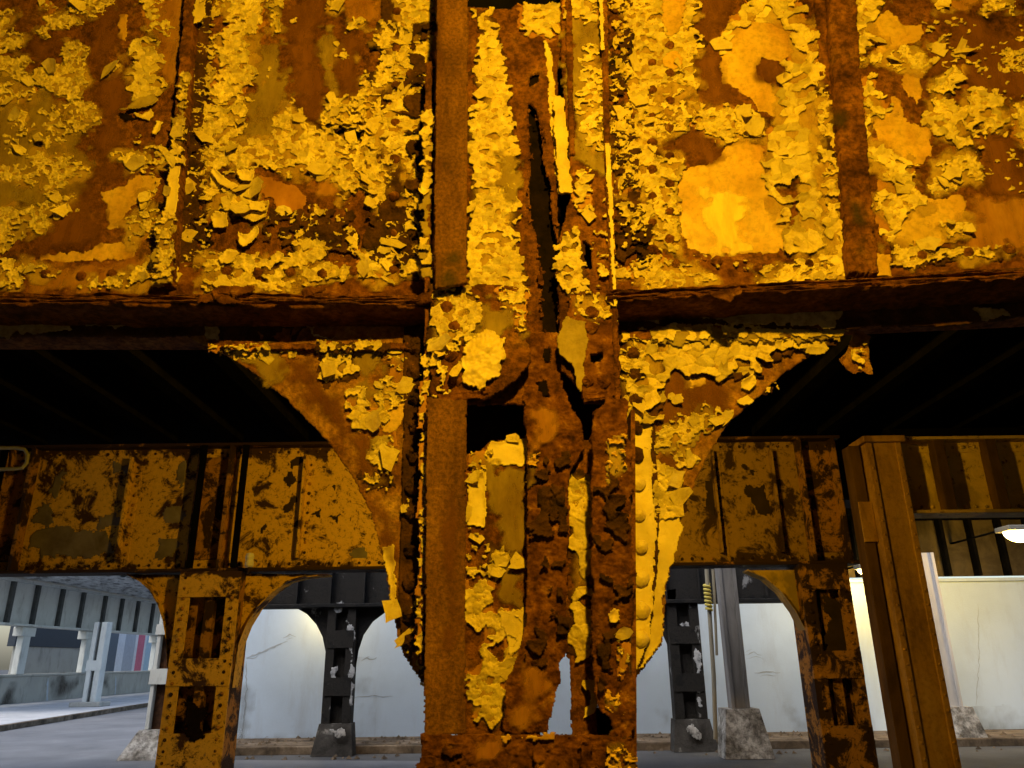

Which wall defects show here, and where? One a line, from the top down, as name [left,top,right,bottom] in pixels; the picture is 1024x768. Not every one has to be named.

corrosion [607,0,654,278]
peeling [856,0,1024,277]
corrosion [197,285,255,305]
peeling [0,0,531,730]
corrosion [280,355,344,428]
peeling [516,0,873,673]
corrosion [710,287,742,303]
corrosion [525,408,572,538]
corrosion [593,433,631,553]
corrosion [415,586,638,768]
spalling [582,678,624,735]